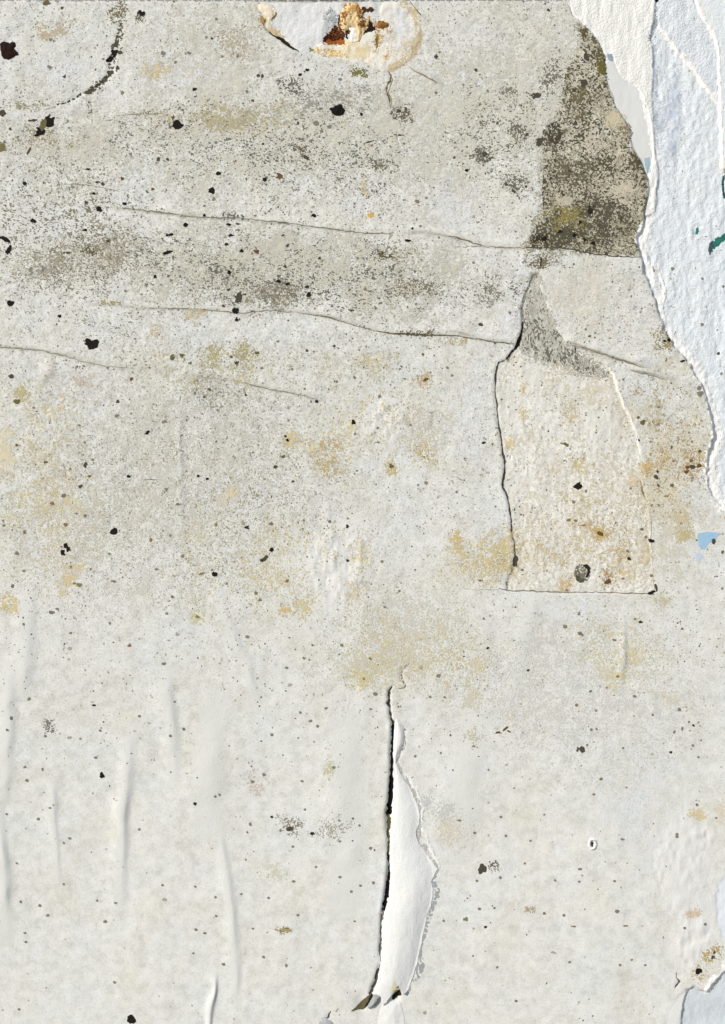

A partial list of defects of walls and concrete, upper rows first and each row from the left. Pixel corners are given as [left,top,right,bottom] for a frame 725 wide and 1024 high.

peeling [260,1,420,72]
rust [314,0,423,72]
crack [72,183,391,234]
peeling [569,0,725,499]
leakage [0,0,725,599]
crack [0,347,134,369]
crack [152,236,662,595]